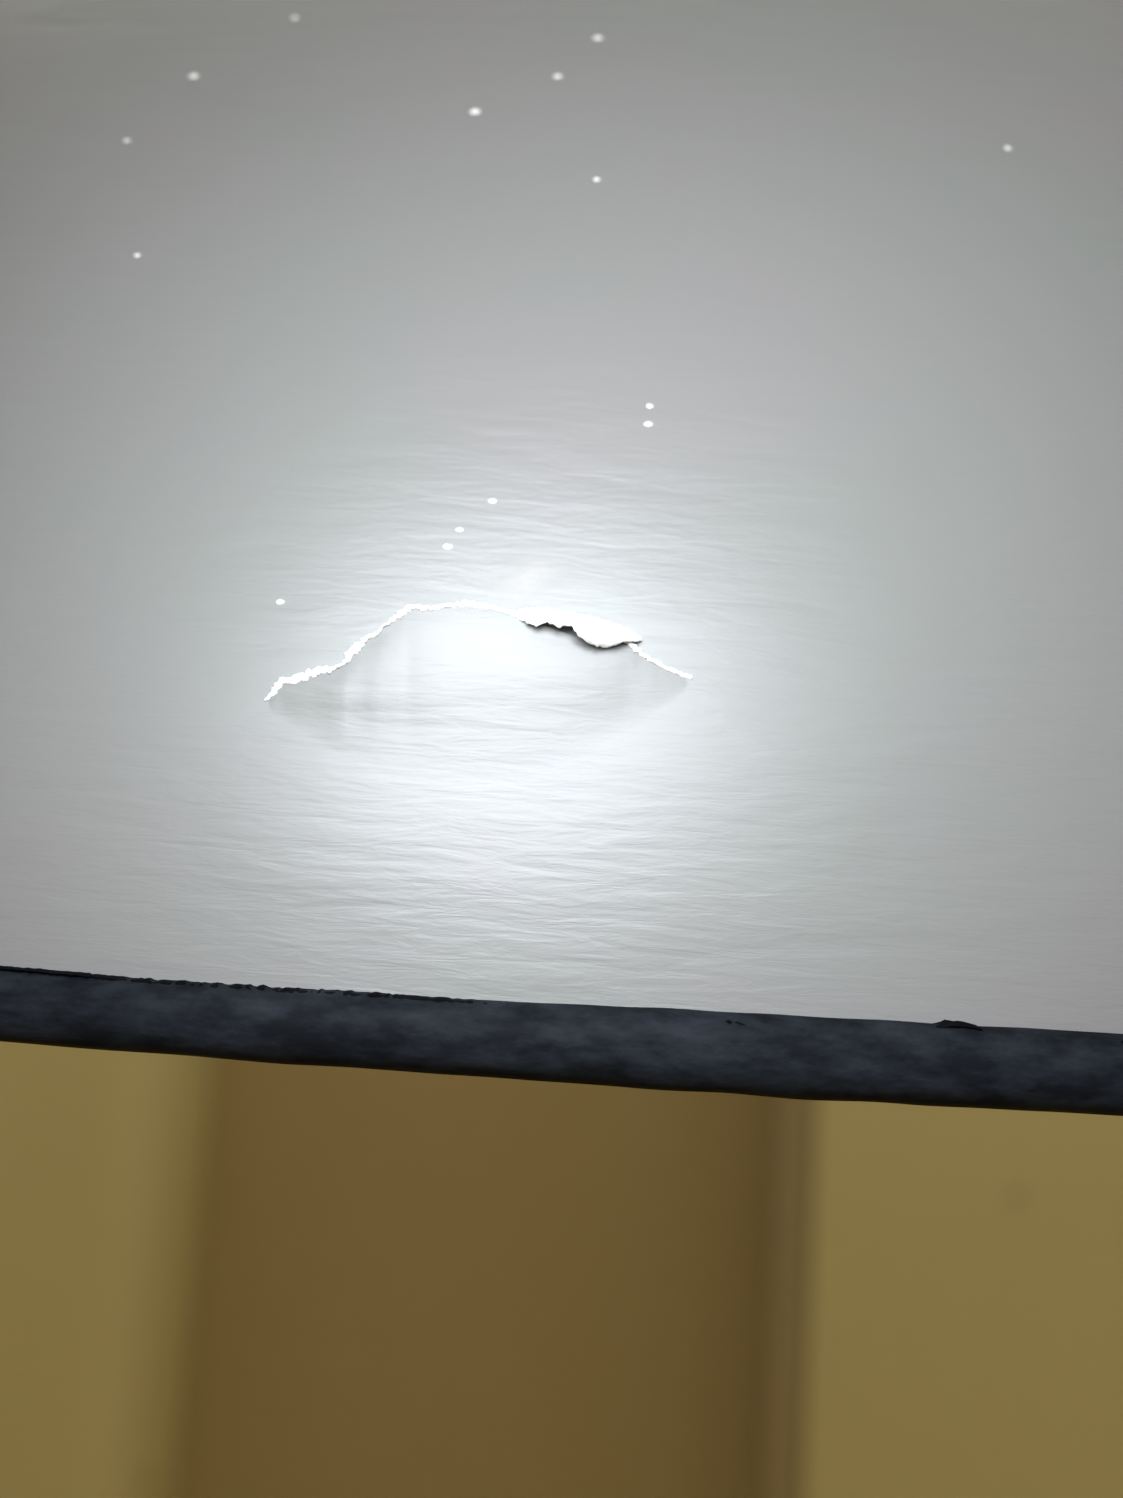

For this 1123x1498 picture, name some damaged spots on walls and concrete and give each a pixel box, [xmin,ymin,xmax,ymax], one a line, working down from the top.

crack [264,600,693,701]